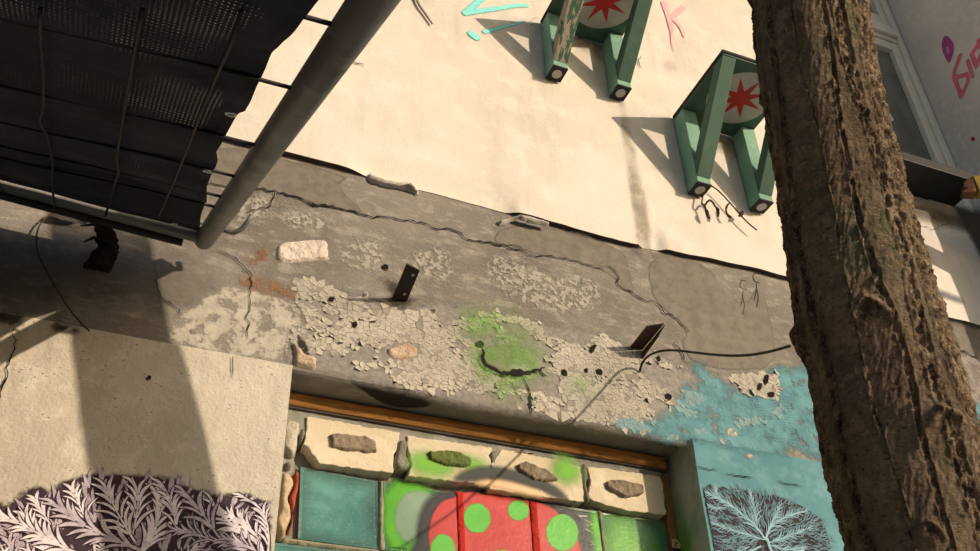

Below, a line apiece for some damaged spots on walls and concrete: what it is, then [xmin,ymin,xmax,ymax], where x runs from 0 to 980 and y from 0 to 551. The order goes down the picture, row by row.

crack [154,266,184,316]
crack [219,251,253,337]
spalling [276,210,384,271]
peeling [412,248,453,282]
crack [249,187,690,363]
peeling [487,256,601,314]
crack [0,328,17,398]
peeling [287,276,707,448]
peeling [720,369,784,444]